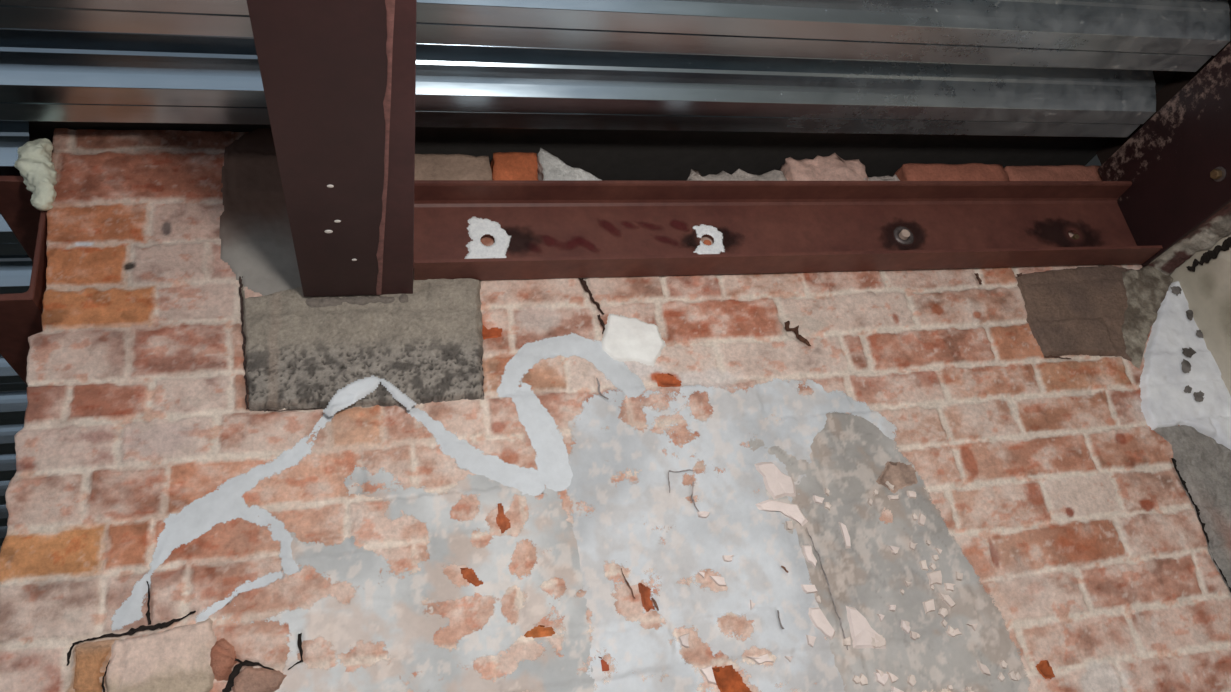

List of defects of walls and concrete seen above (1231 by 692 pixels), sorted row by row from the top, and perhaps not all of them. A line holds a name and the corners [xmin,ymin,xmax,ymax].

crack [579,278,605,334]
peeling [601,314,682,387]
spalling [1181,310,1204,402]
spalling [496,503,511,534]
spalling [460,567,483,587]
spalling [638,583,655,612]
crack [66,581,196,692]
spalling [210,638,287,692]
crack [222,633,303,692]
spalling [524,625,555,638]
spalling [699,665,752,692]
spalling [1036,660,1055,679]